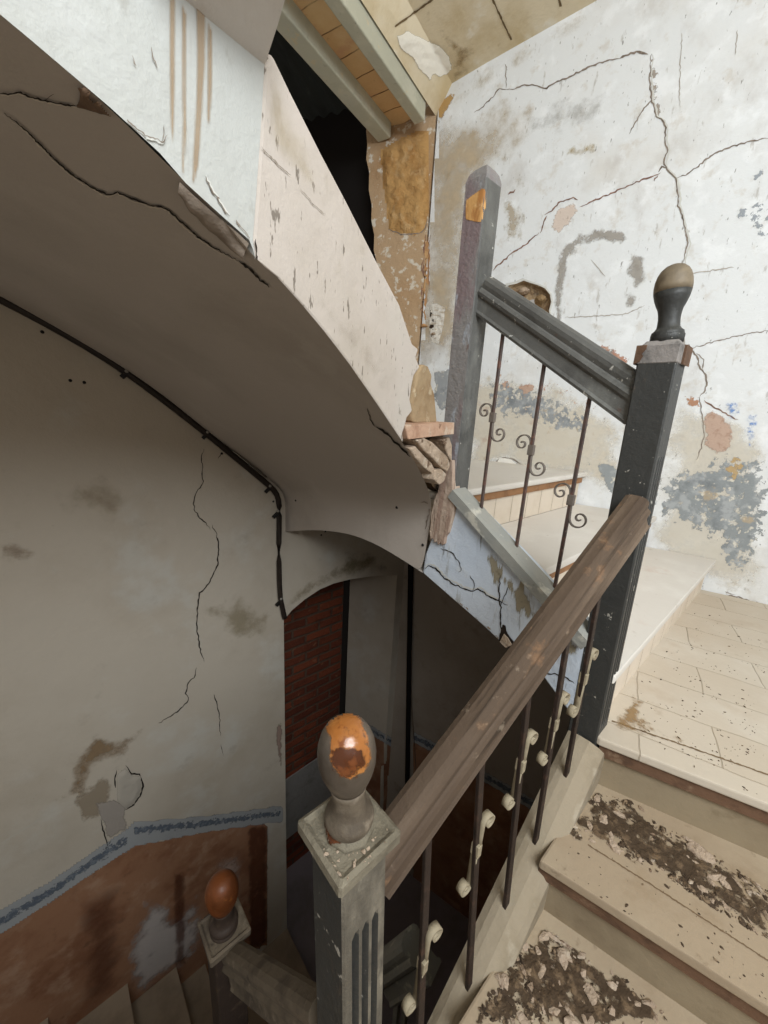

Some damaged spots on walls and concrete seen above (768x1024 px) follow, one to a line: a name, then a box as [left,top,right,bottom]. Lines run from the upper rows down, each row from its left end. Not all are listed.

flaking render [397,31,452,80]
crack [0,91,269,287]
flaking render [381,131,429,235]
crack [475,33,768,274]
flaking render [406,365,449,423]
crack [684,330,767,460]
spalling [402,435,452,491]
peeling [656,396,768,576]
crack [160,453,221,723]
crack [425,549,509,628]
water stain [72,740,125,791]
flaking render [77,766,144,837]